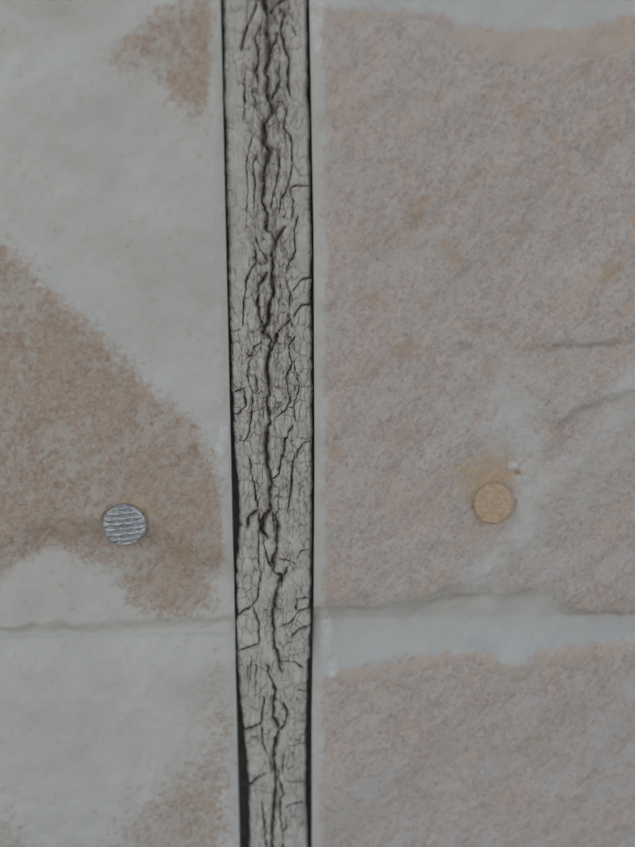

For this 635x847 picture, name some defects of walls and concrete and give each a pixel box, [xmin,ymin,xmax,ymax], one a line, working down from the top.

crack [230,0,313,847]